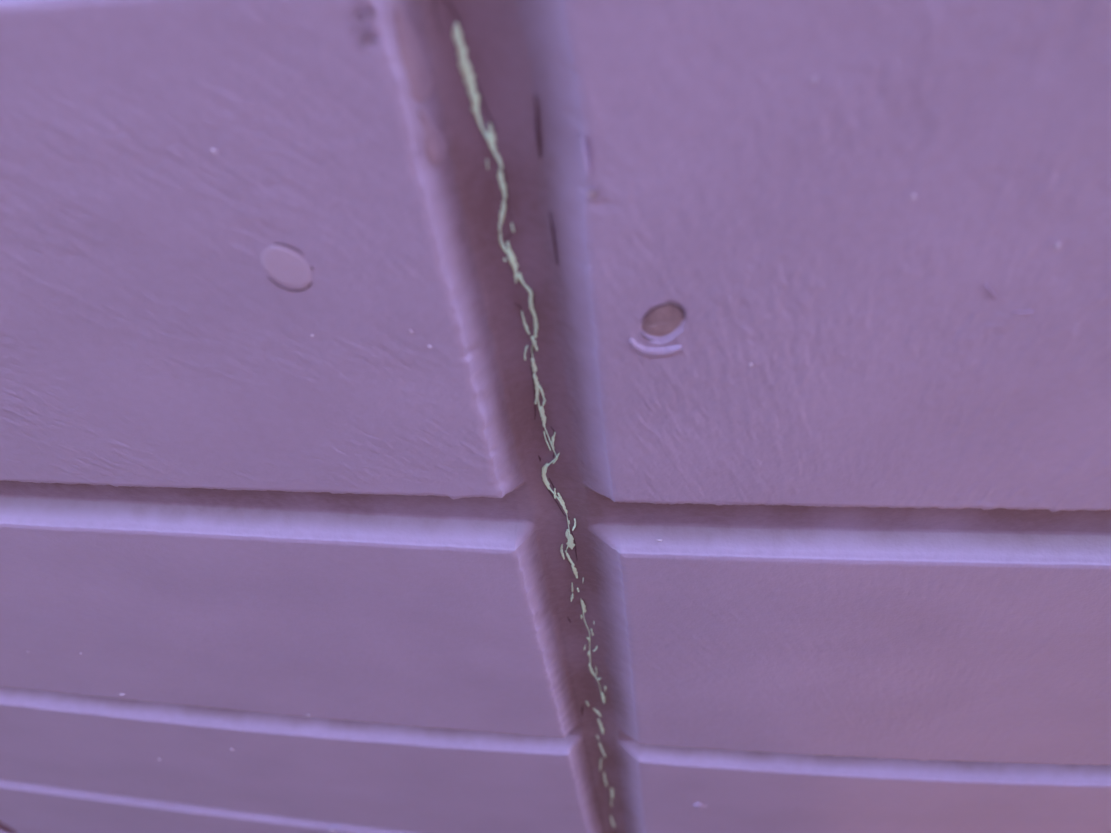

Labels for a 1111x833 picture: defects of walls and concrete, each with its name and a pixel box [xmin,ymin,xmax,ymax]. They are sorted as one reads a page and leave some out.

crack [434,0,615,828]
spalling [629,303,685,358]